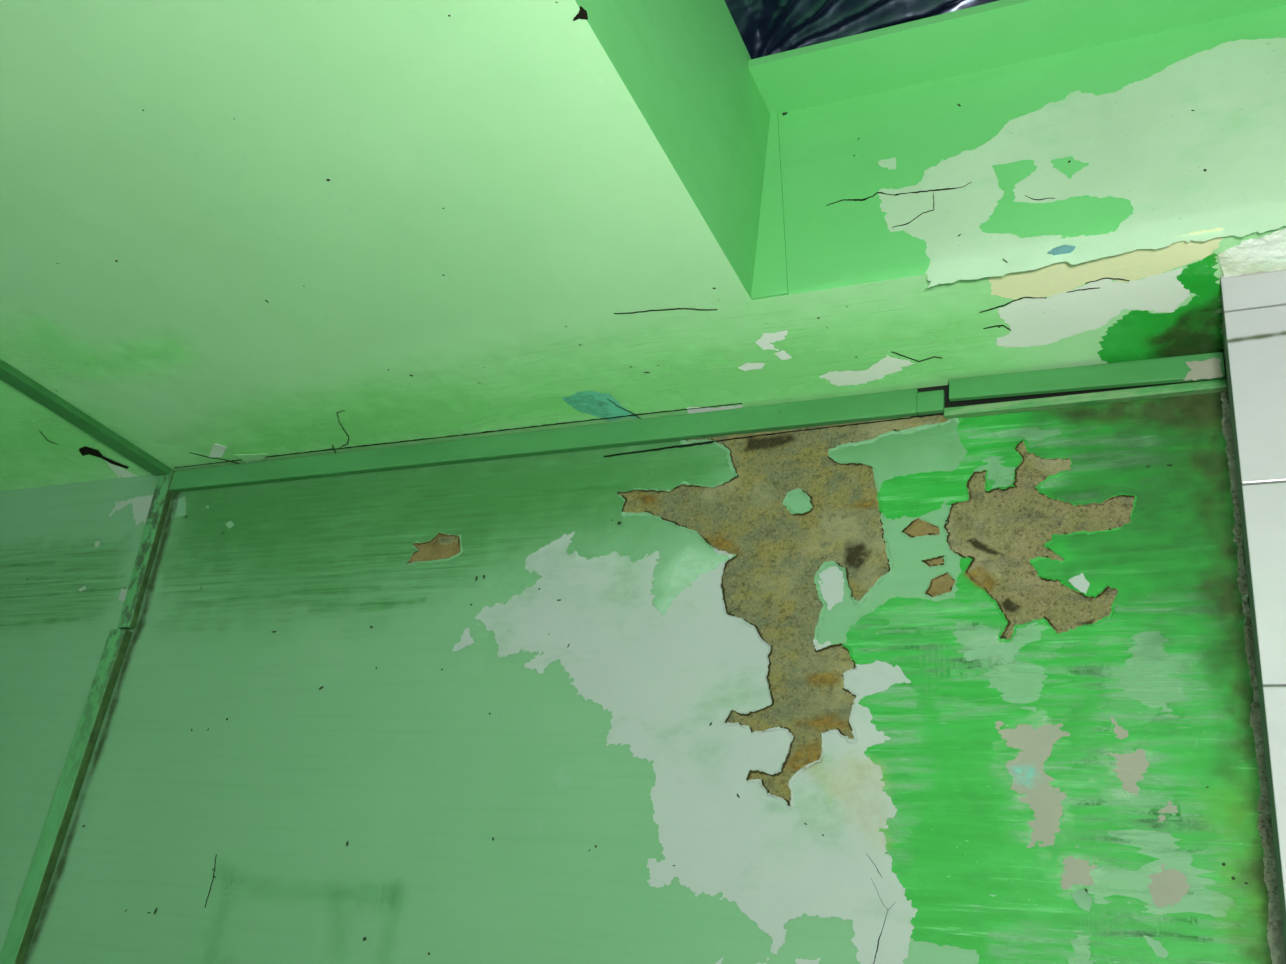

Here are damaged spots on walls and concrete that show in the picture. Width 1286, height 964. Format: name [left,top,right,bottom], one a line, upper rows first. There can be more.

crack [826,182,971,228]
spalling [406,531,463,566]
peeling [452,38,1286,964]
crack [867,855,894,964]